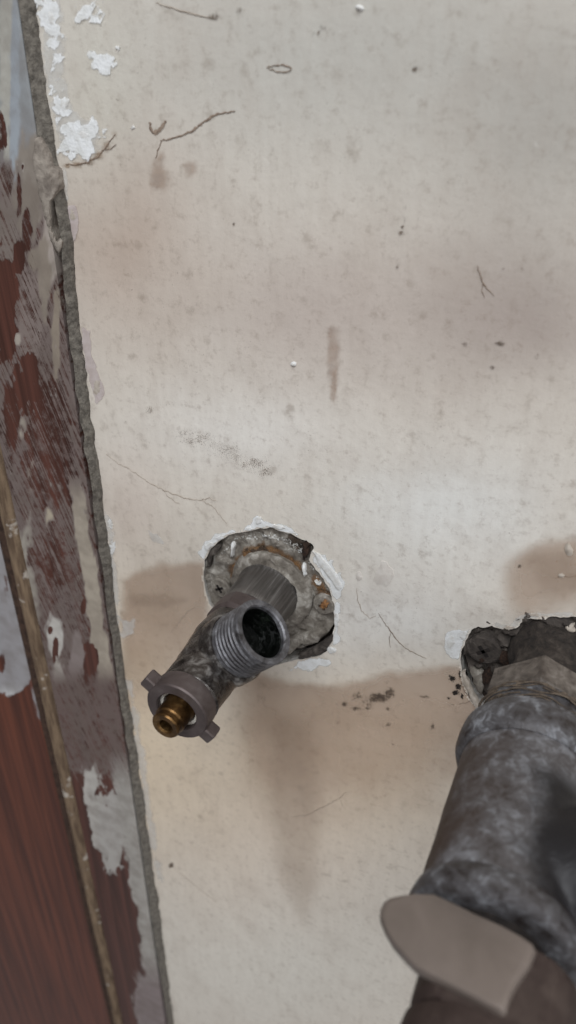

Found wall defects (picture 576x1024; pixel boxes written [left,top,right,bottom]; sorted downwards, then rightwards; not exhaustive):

peeling [34,0,65,72]
peeling [87,46,120,75]
peeling [49,85,107,161]
peeling [68,205,78,241]
peeling [82,328,104,403]
crack [106,454,227,524]
spalling [198,516,298,560]
corrosion [229,542,301,577]
spalling [291,551,345,671]
corrosion [312,575,331,609]
crack [356,589,425,658]
spalling [444,629,468,659]